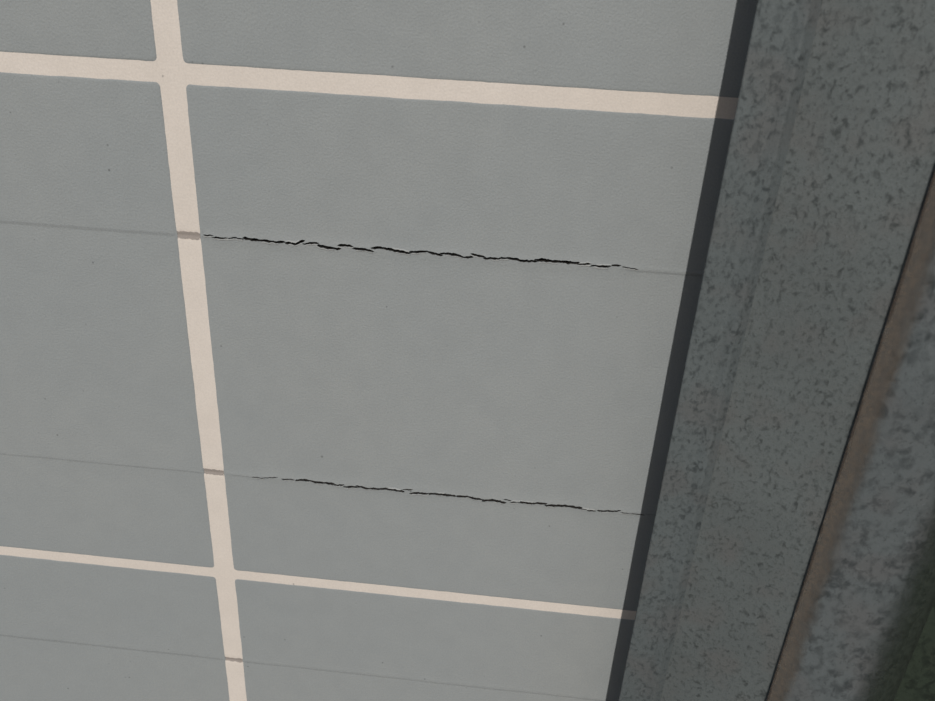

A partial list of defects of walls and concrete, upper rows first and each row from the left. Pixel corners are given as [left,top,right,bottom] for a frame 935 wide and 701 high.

crack [202,234,639,271]
crack [253,477,642,515]